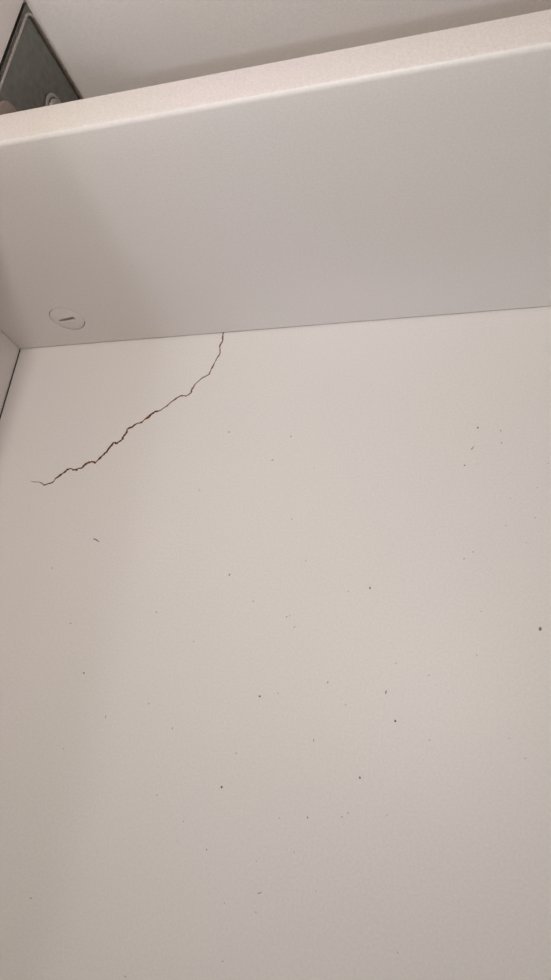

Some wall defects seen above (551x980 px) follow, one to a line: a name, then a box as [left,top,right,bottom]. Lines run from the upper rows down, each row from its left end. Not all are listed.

crack [31,332,224,486]